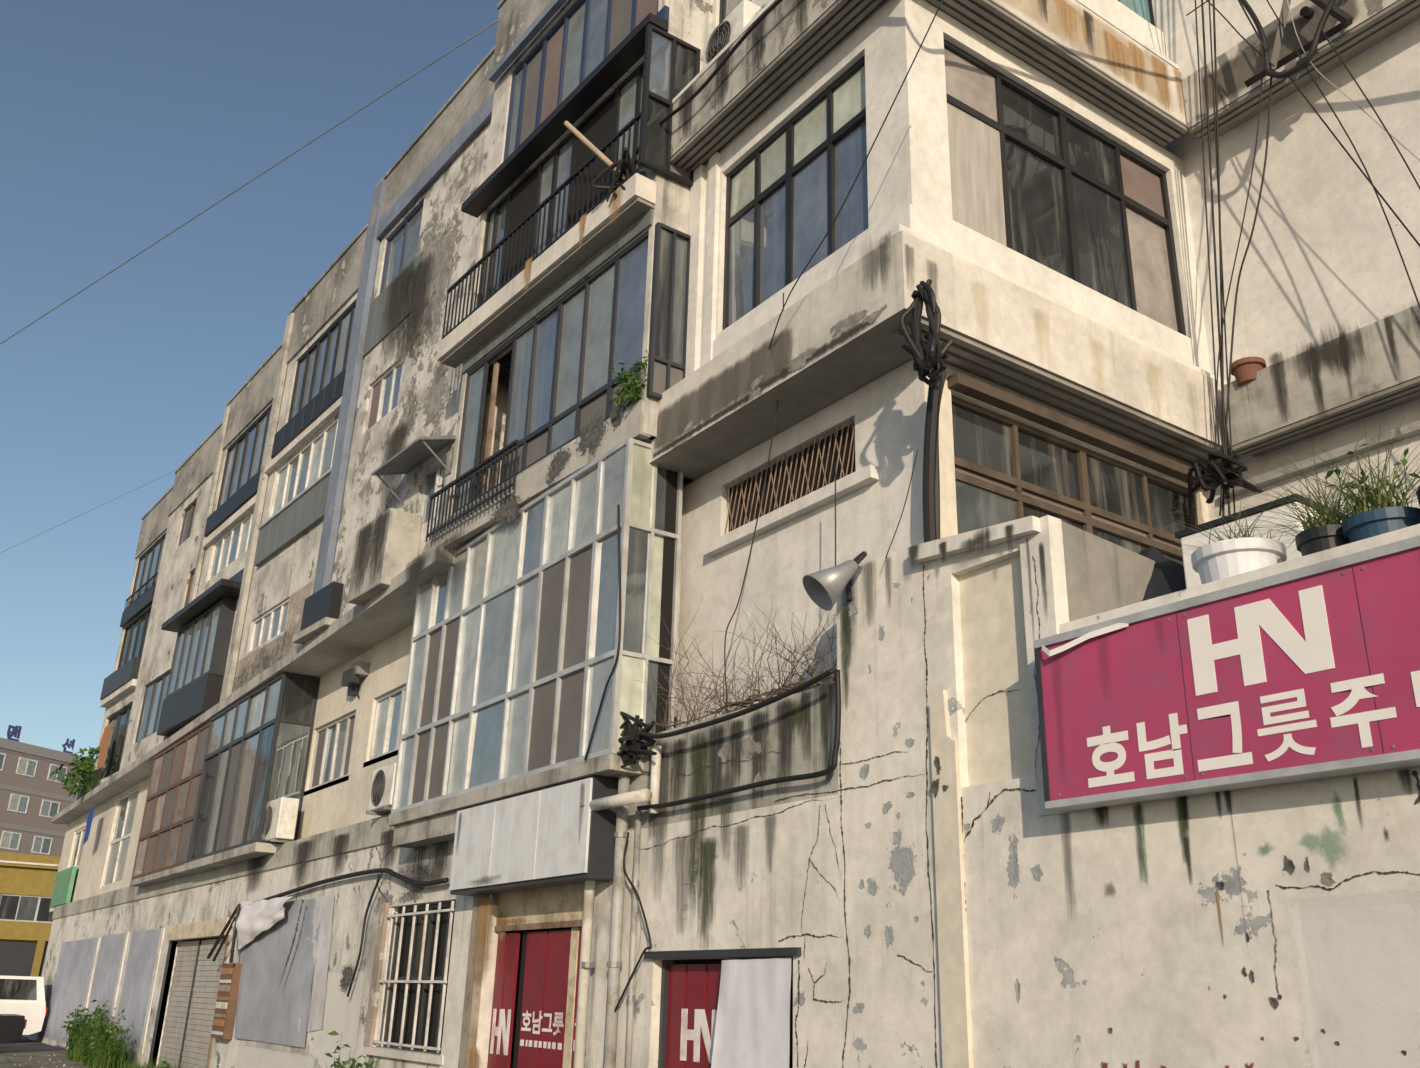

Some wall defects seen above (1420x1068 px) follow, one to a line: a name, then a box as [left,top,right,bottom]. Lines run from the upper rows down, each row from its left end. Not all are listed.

rust [1058,0,1087,42]
rust [1105,32,1182,107]
peeling [395,211,463,438]
leakage [1270,330,1363,412]
leakage [354,423,407,592]
leakage [648,559,890,934]
crack [631,558,1040,1068]
peeling [865,756,948,887]
leakage [1177,796,1191,879]
spalling [1283,856,1335,886]
crack [1267,871,1420,1000]
crack [1412,770,1420,805]